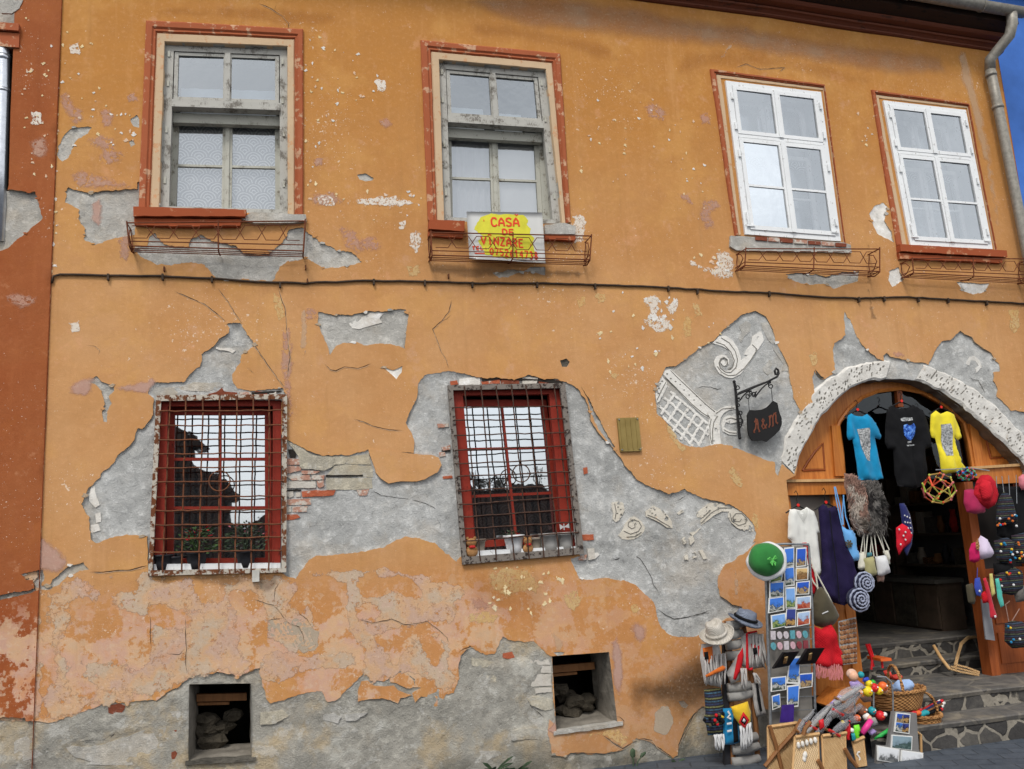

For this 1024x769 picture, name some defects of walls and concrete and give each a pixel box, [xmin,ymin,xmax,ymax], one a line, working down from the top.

peeling [304,139,422,276]
flaking render [869,203,894,242]
crack [176,288,291,389]
flaking render [632,296,821,475]
flaking render [809,313,1024,435]
flaking render [0,172,756,769]
flaking render [735,709,769,748]